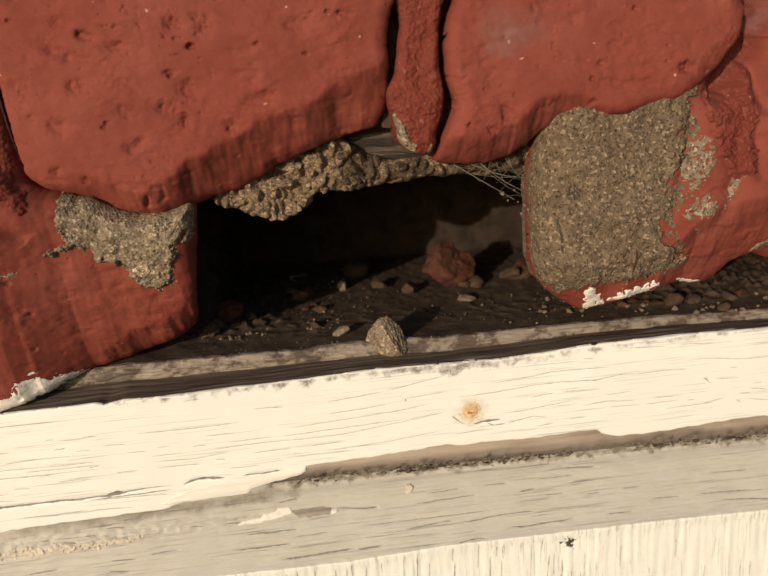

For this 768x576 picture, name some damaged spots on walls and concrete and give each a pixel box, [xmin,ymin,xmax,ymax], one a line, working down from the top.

crack [387,8,397,82]
crack [436,0,449,136]
crack [381,106,391,128]
spalling [211,84,746,294]
spalling [42,191,195,292]
peeling [405,308,768,353]
peeling [52,340,381,391]
peeling [161,468,307,506]
peeling [239,506,338,525]